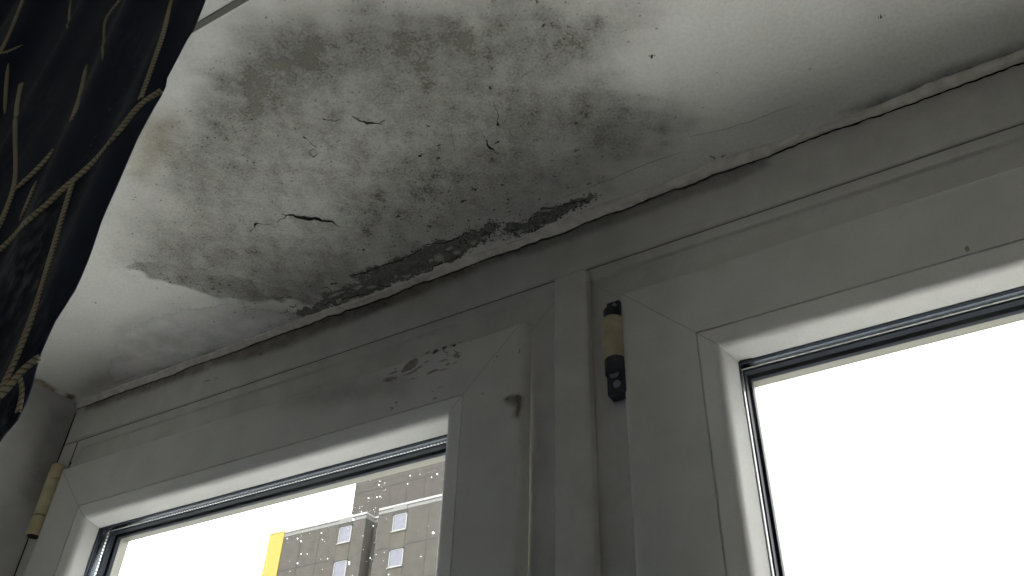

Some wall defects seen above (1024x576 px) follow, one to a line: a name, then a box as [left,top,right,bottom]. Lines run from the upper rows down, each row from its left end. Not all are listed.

water stain [116,0,676,360]
flaking render [295,193,597,317]
crack [56,62,1024,463]